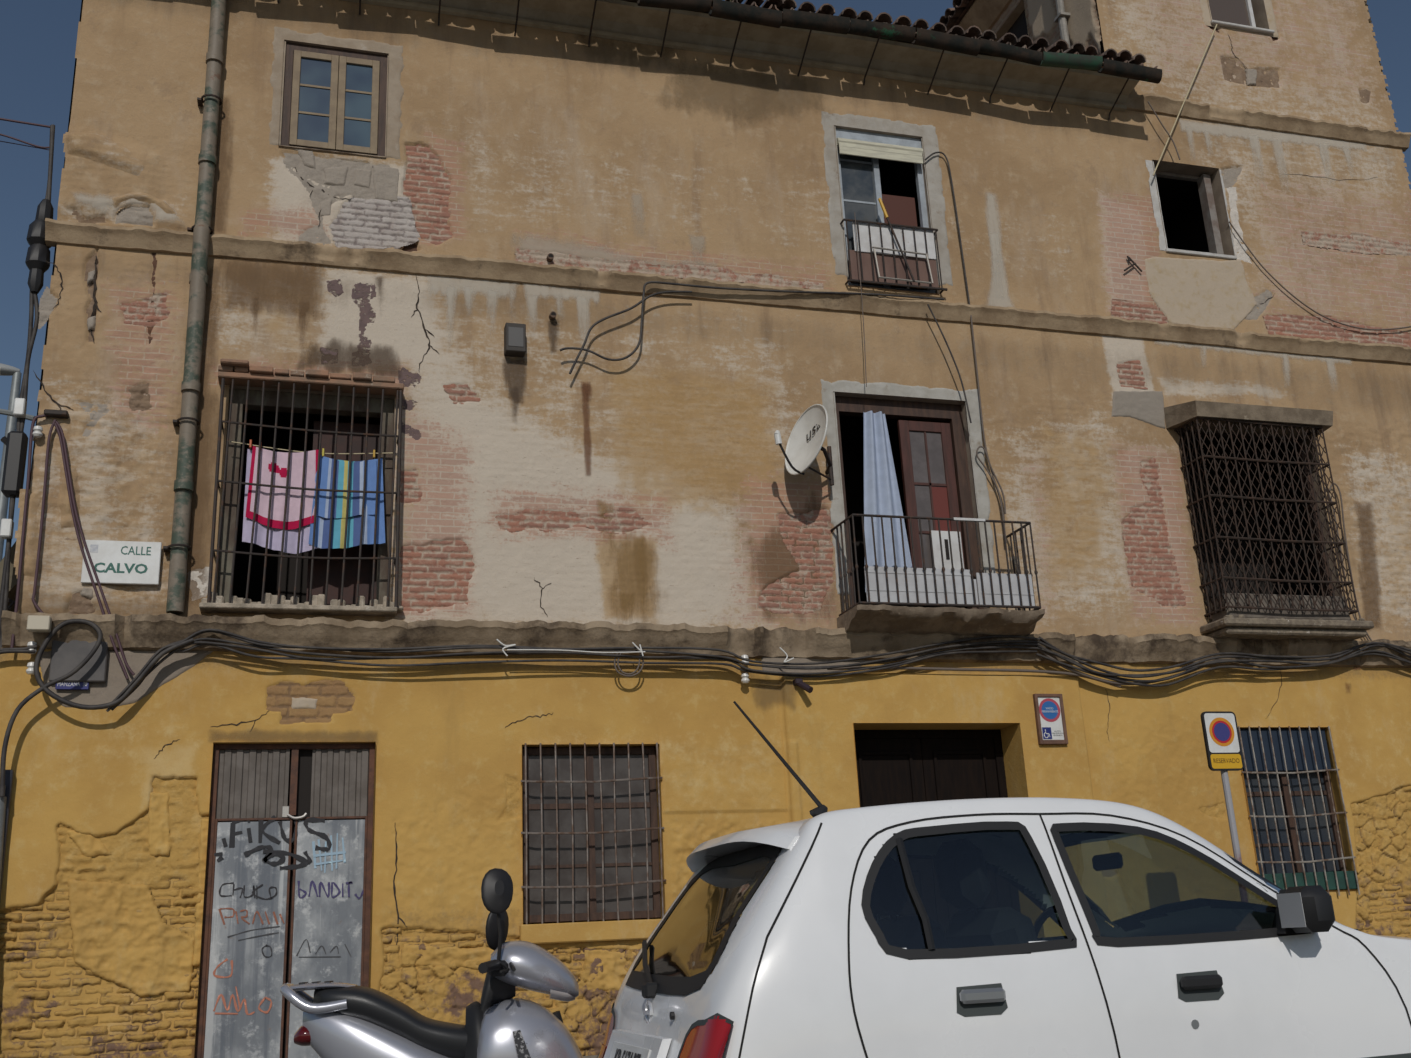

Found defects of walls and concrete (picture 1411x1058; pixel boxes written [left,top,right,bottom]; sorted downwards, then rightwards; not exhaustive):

flaking render [283,144,453,252]
crack [45,256,101,342]
crack [411,276,439,369]
flaking render [399,540,475,613]
flaking render [495,507,652,534]
flaking render [758,508,835,614]
flaking render [1121,458,1186,608]
flaking render [266,680,355,724]
peeling [67,819,209,998]
peeling [402,943,494,970]
peeling [584,949,636,991]